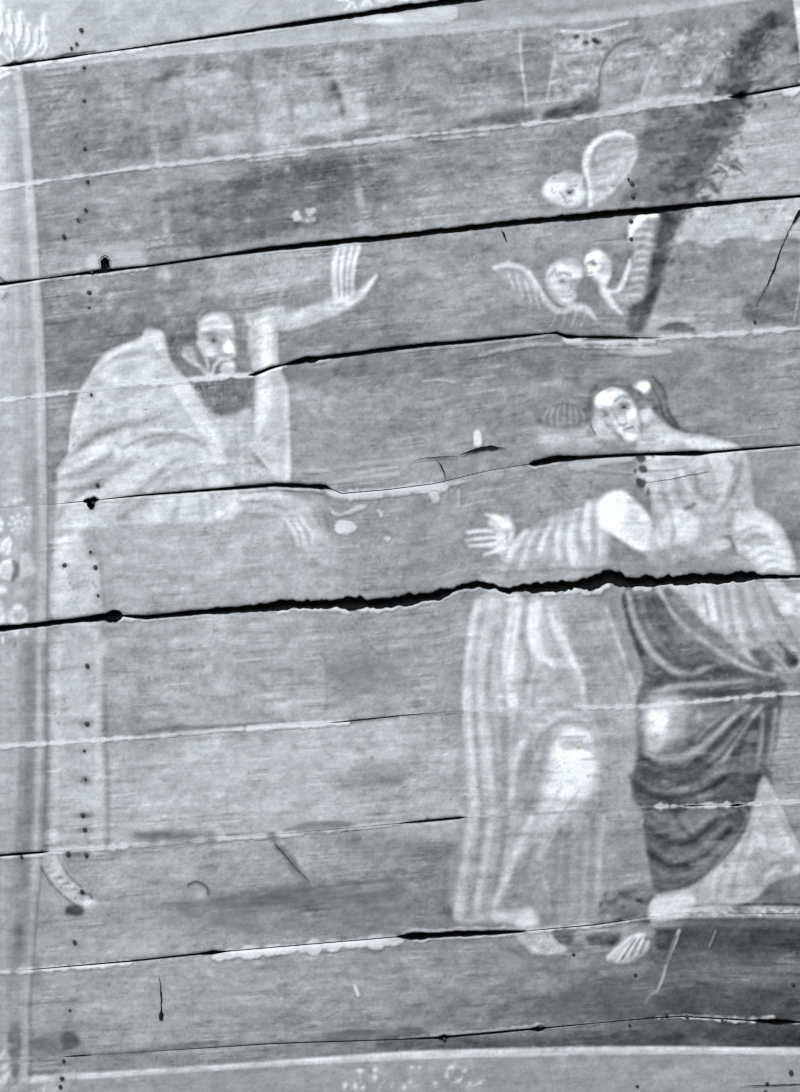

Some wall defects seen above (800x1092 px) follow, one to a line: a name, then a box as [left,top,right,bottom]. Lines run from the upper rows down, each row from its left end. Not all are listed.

crack [0,0,482,72]
crack [0,77,800,193]
crack [0,195,800,404]
crack [2,444,800,508]
crack [0,570,800,635]
crack [0,913,679,1020]